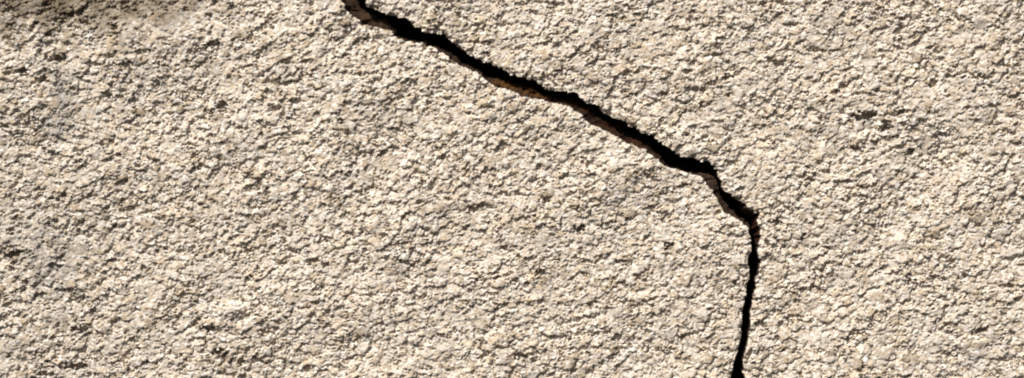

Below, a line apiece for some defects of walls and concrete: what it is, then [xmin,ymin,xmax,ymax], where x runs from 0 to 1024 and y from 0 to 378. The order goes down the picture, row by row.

crack [341,0,761,378]